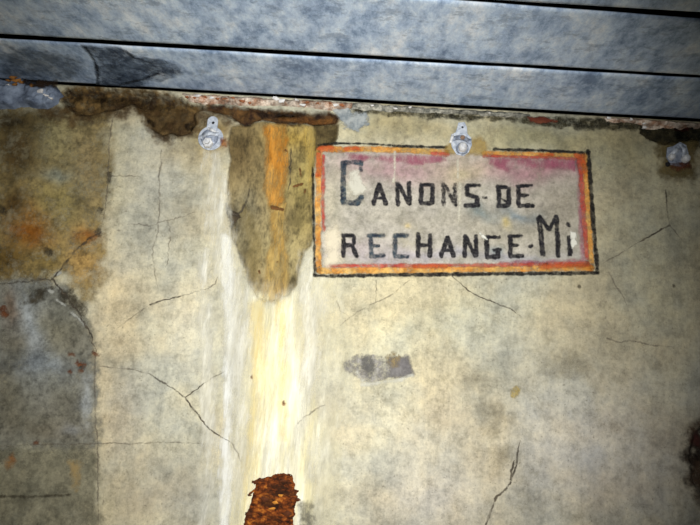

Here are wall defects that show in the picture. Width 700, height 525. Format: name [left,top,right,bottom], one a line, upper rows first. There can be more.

crack [9,232,101,352]
leakage [198,156,413,525]
crack [155,377,230,442]
rust [244,473,300,525]
crack [486,443,520,524]